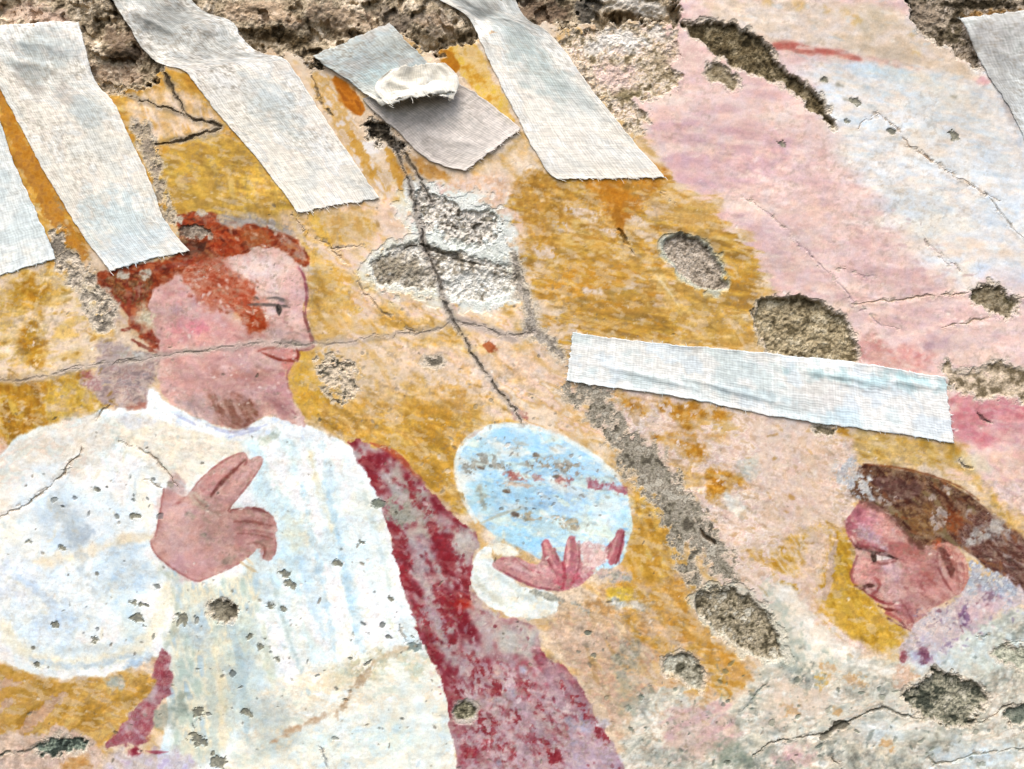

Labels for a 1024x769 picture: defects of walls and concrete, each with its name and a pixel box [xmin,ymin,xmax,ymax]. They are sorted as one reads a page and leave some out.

spalling [0,0,175,99]
crack [129,73,224,146]
spalling [192,0,497,74]
spalling [516,0,839,141]
spalling [904,0,1024,75]
crack [859,112,1024,240]
crack [0,145,537,426]
spalling [364,179,570,365]
spalling [748,290,864,363]
crack [743,198,972,330]
crack [0,447,83,519]
spalling [555,377,792,669]